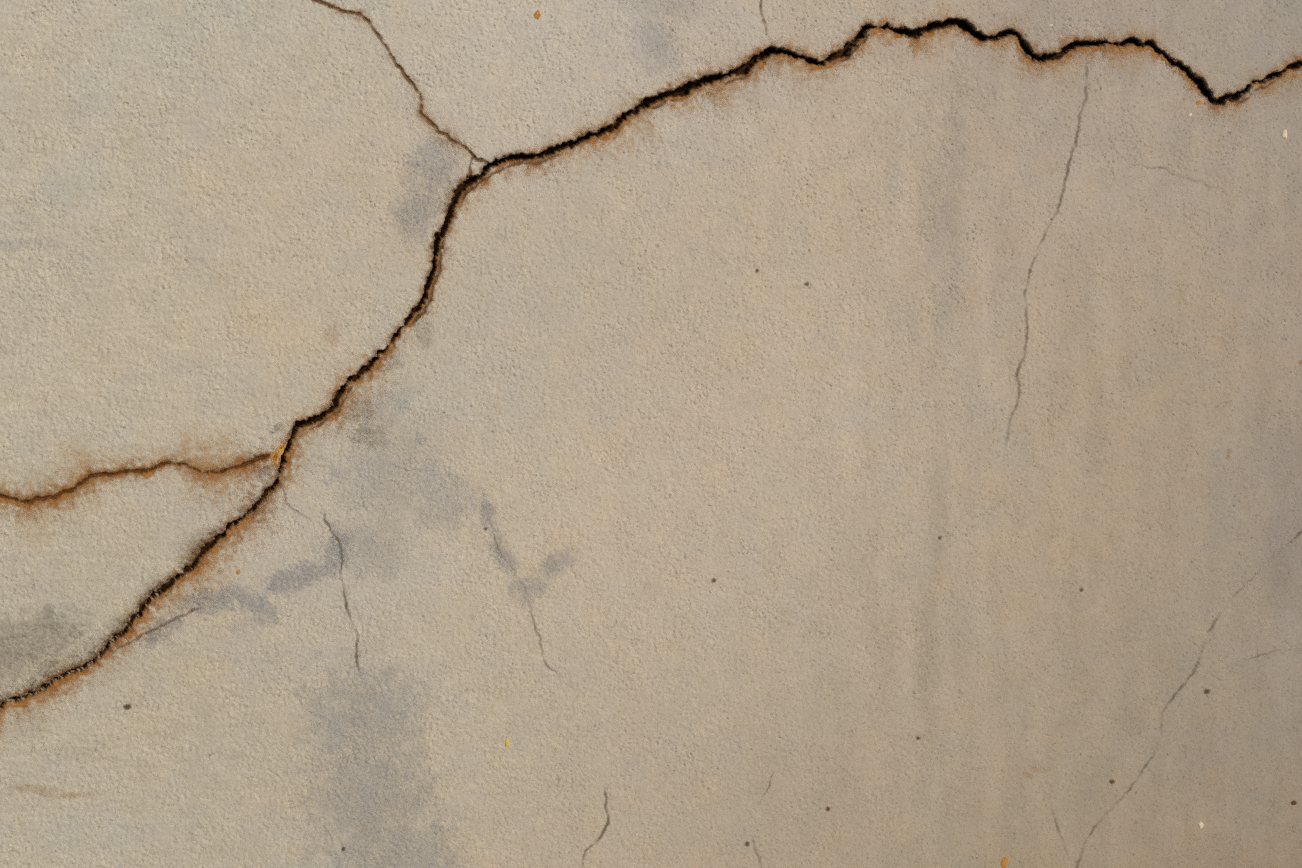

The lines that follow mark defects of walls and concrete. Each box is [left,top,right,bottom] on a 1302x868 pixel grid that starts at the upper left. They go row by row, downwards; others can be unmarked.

corrosion [1202,59,1302,113]
crack [278,0,1302,473]
corrosion [0,17,1202,713]
crack [0,462,198,503]
crack [210,454,270,473]
crack [12,479,278,701]
crack [324,518,359,669]
crack [583,792,610,859]